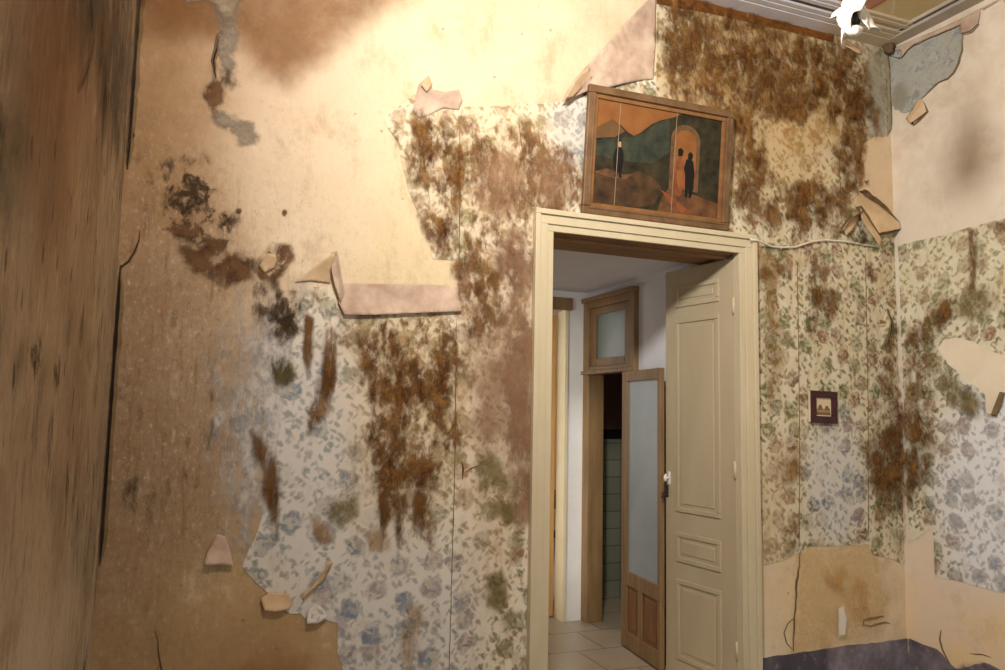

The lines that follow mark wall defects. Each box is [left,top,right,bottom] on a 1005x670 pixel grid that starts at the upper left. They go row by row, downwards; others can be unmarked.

damp [71,0,138,162]
spalling [187,0,259,145]
damp [154,0,373,70]
spalling [882,42,895,54]
damp [162,162,237,248]
damp [254,281,301,342]
damp [272,358,296,384]
damp [928,353,978,415]
flaking render [939,337,1005,417]
damp [476,457,513,521]
damp [488,571,513,623]